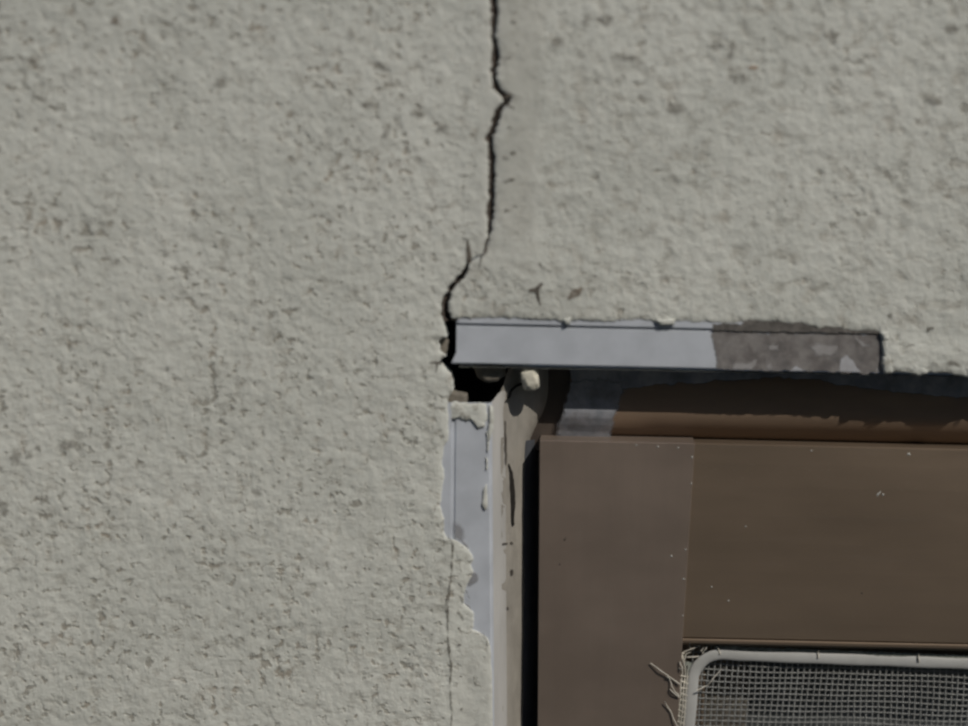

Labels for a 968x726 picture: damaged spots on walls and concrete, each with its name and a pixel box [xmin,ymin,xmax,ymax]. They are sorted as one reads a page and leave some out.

crack [441,0,514,321]